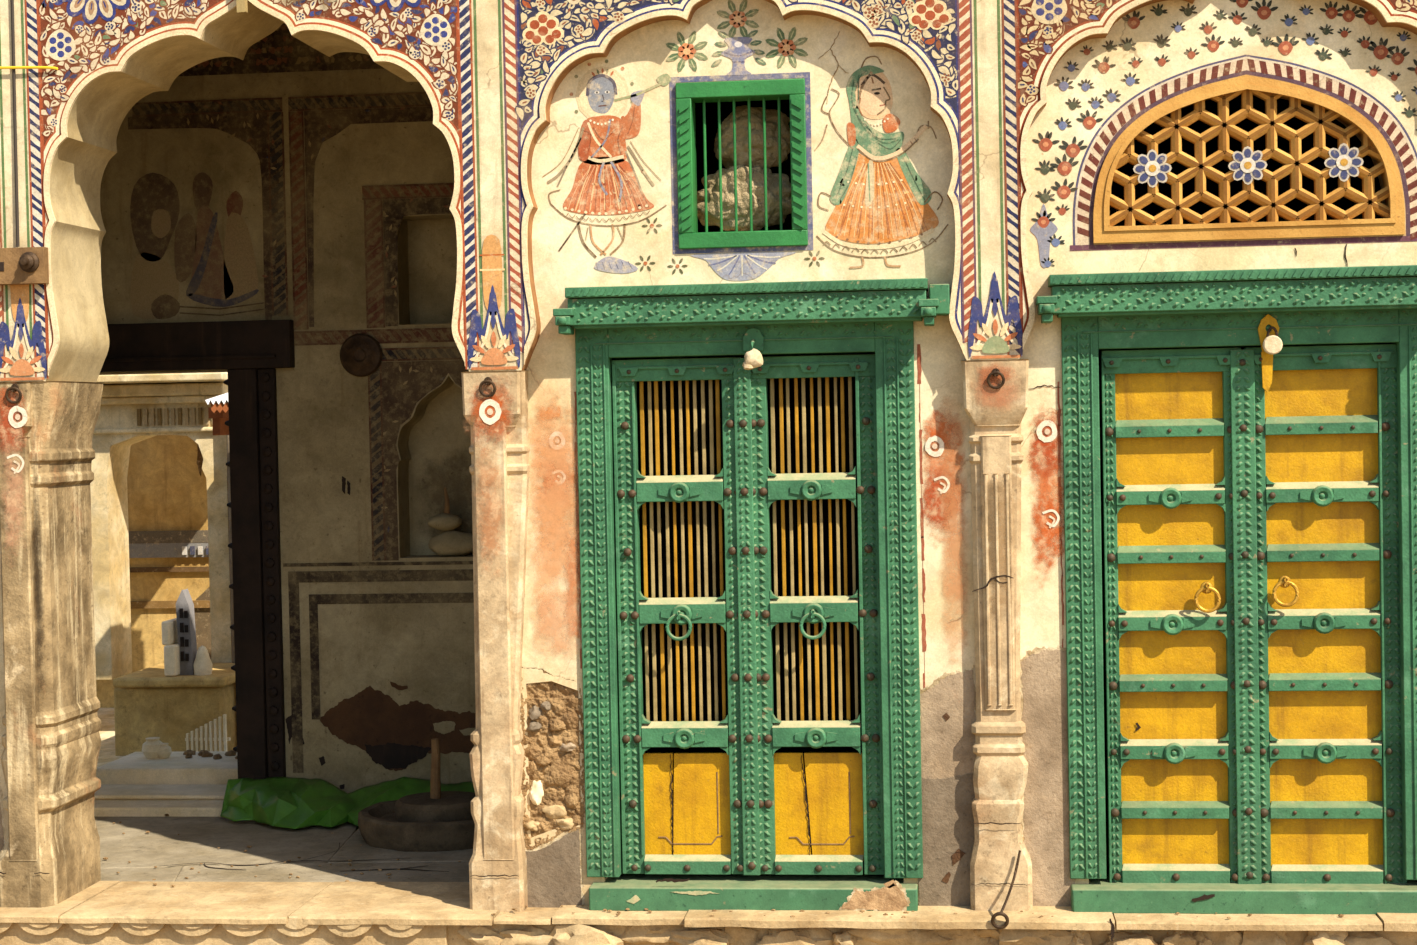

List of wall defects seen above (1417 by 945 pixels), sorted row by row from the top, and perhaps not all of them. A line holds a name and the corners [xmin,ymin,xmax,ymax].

crack [972,575,1013,592]
peeling [320,682,476,774]
spalling [521,667,585,850]
peeling [920,665,976,779]
peeling [839,880,910,911]